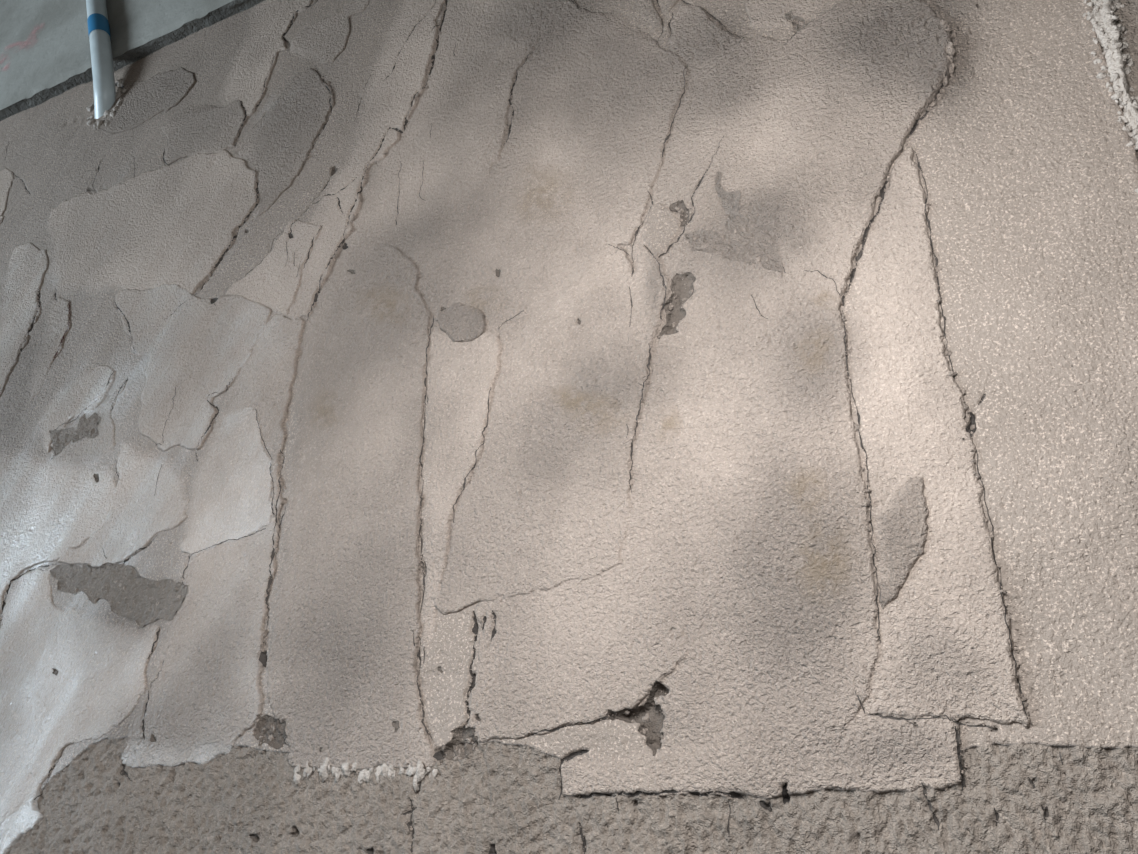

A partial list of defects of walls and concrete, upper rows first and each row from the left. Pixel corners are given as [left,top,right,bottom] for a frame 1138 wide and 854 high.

crack [165,0,456,320]
crack [608,136,724,492]
crack [907,71,955,379]
spalling [49,413,101,456]
spalling [50,562,187,628]
crack [182,409,286,645]
crack [413,316,497,749]
crack [966,393,1028,719]
spalling [252,714,287,749]
spalling [433,713,481,765]
spalling [606,681,669,756]
spalling [759,783,790,812]